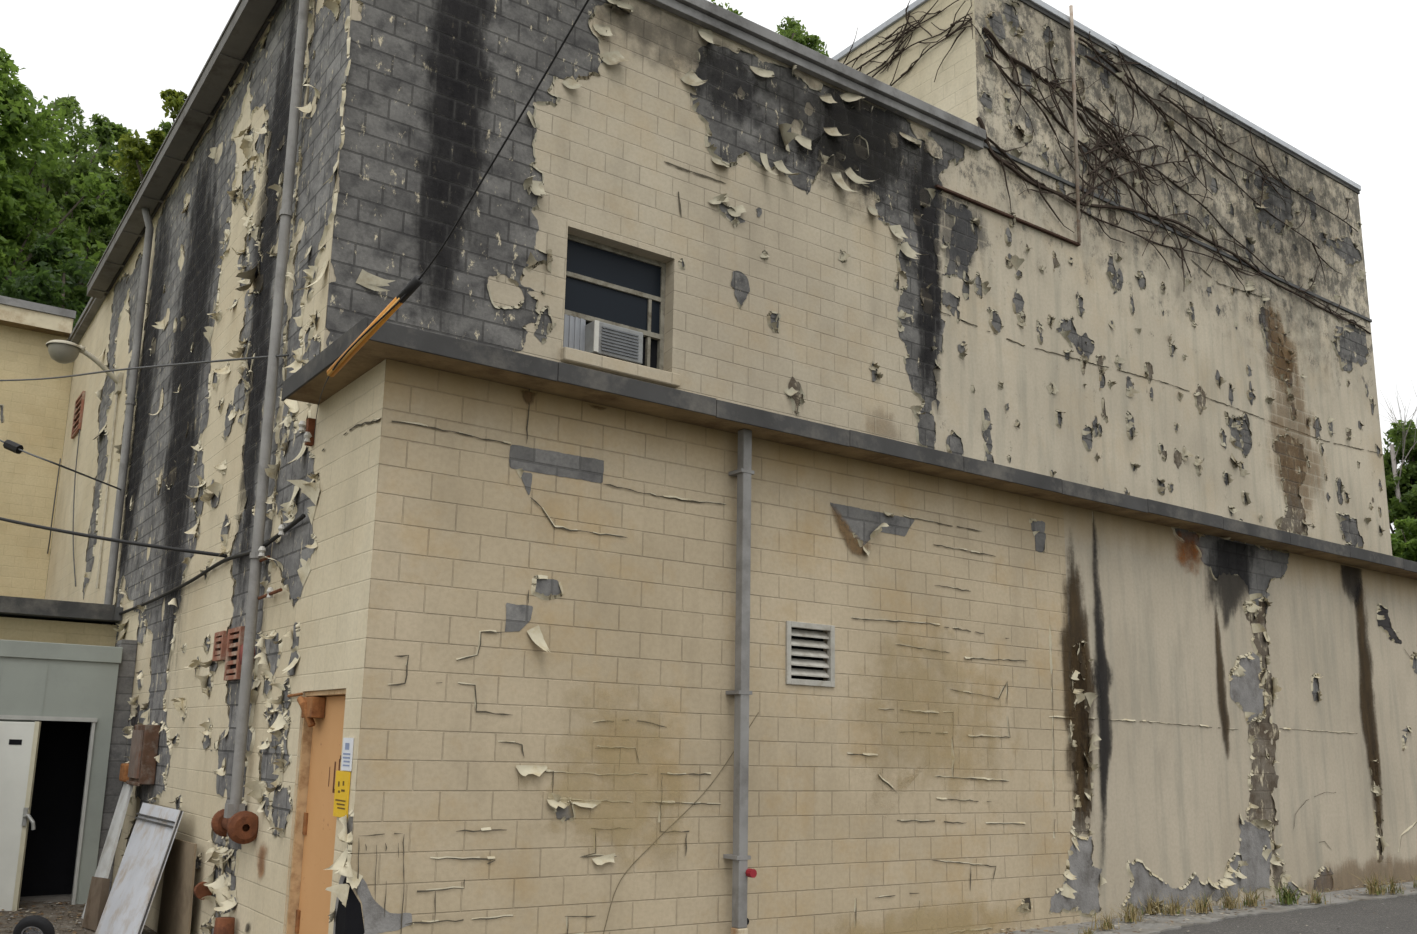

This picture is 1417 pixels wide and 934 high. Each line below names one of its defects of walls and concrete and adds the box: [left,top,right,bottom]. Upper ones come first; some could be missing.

damp [165,183,215,508]
peeling [82,0,635,856]
damp [432,72,478,147]
peeling [681,29,1154,463]
peeling [1177,275,1385,549]
spalling [323,809,415,934]
crack [356,827,513,934]
crack [388,630,721,858]
crack [565,916,595,934]
spalling [1049,639,1107,918]
peeling [1121,526,1333,914]
damp [1357,591,1381,816]